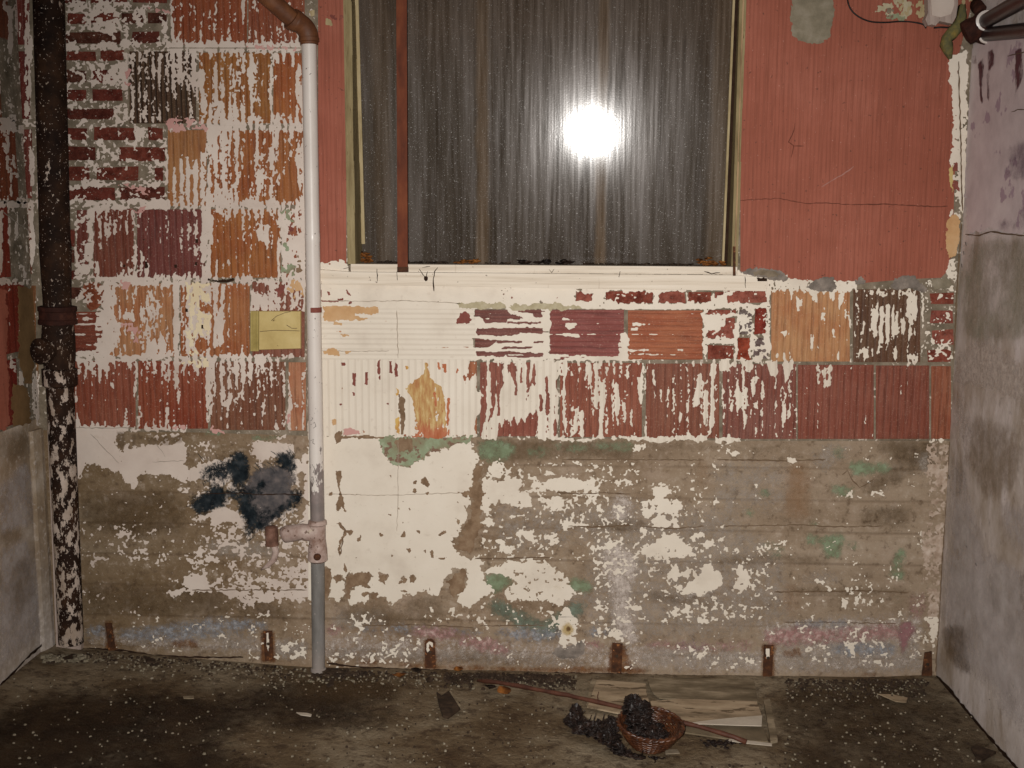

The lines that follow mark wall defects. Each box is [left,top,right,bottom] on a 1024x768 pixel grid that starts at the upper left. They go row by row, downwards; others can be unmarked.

peeling [66,0,311,660]
peeling [320,38,1024,671]
crack [740,61,1024,358]